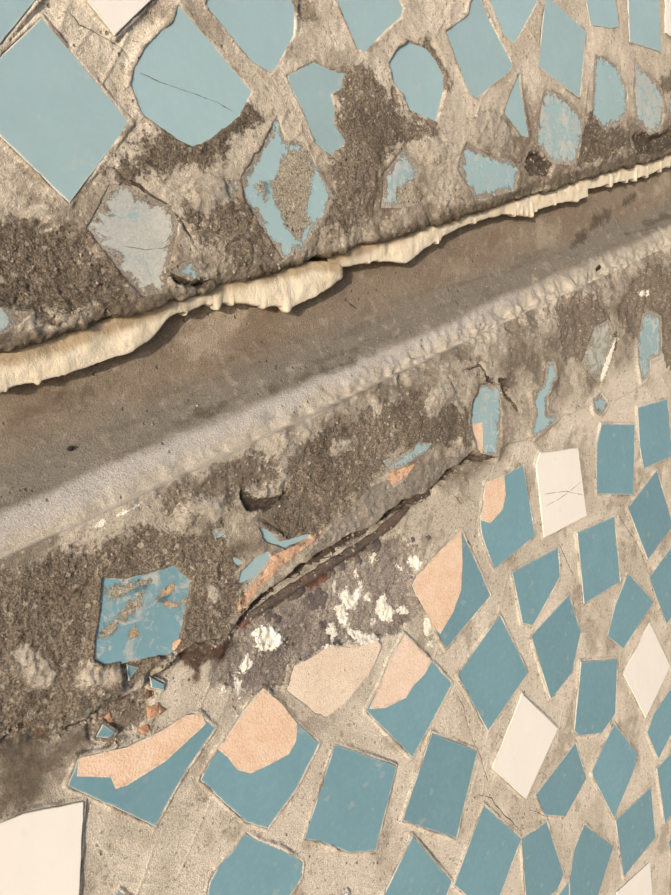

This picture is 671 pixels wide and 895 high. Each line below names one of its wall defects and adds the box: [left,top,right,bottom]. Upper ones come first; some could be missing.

spalling [101,102,265,187]
spalling [323,63,440,236]
spalling [525,150,552,177]
spalling [576,110,671,167]
spalling [0,213,127,333]
spalling [181,197,277,273]
crack [448,364,518,411]
crack [243,451,495,614]
spalling [0,391,474,756]
crack [195,637,224,646]
crack [67,661,174,726]